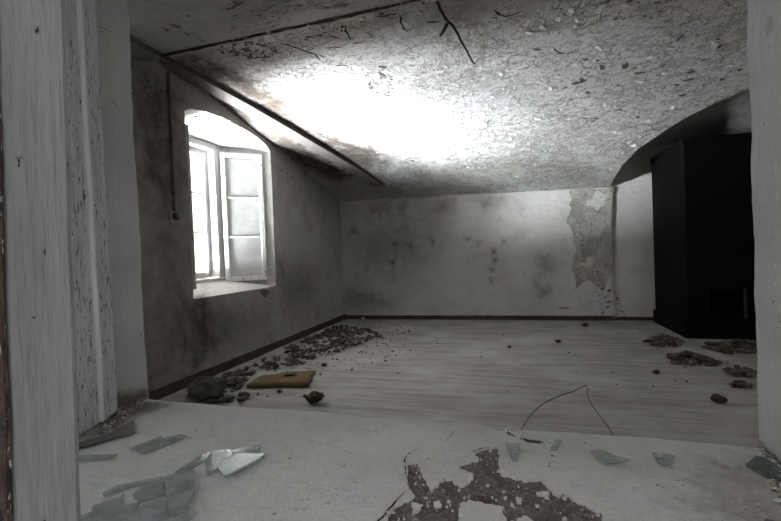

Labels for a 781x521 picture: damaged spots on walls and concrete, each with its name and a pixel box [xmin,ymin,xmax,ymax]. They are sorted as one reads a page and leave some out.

crack [163,0,440,66]
peeling [216,0,426,61]
crack [492,8,527,18]
damp [194,61,387,181]
peeling [565,187,628,318]
flaking render [385,445,603,521]